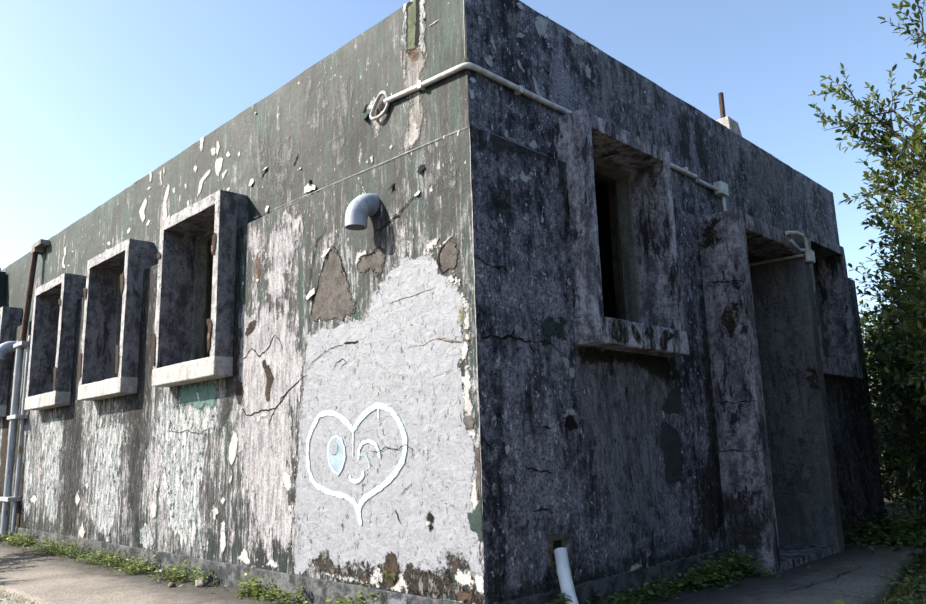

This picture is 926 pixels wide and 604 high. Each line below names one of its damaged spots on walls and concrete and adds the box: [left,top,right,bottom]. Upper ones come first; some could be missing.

peeling [187,137,240,206]
damp [58,297,85,536]
damp [122,265,157,546]
peeling [140,382,226,556]
damp [220,206,306,559]
spalling [262,360,274,401]
crack [242,341,358,424]
peeling [423,235,476,439]
damp [572,251,772,585]
spalling [324,551,409,604]
damp [309,546,560,604]
peeling [443,569,484,604]